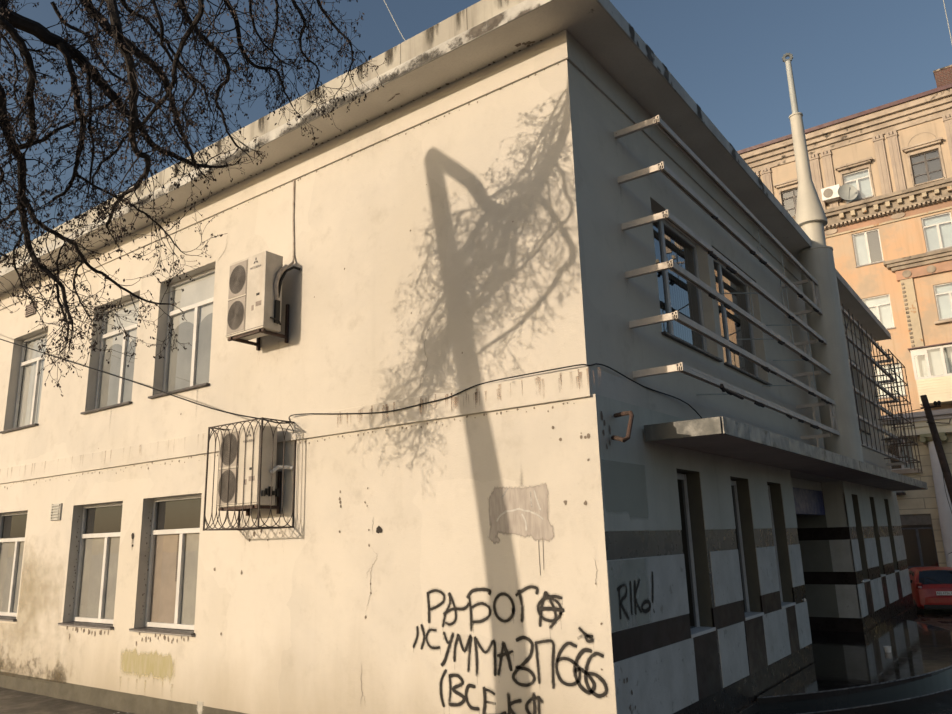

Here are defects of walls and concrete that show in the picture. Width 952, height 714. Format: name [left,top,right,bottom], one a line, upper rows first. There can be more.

water stain [372,48,394,89]
water stain [48,670,65,684]